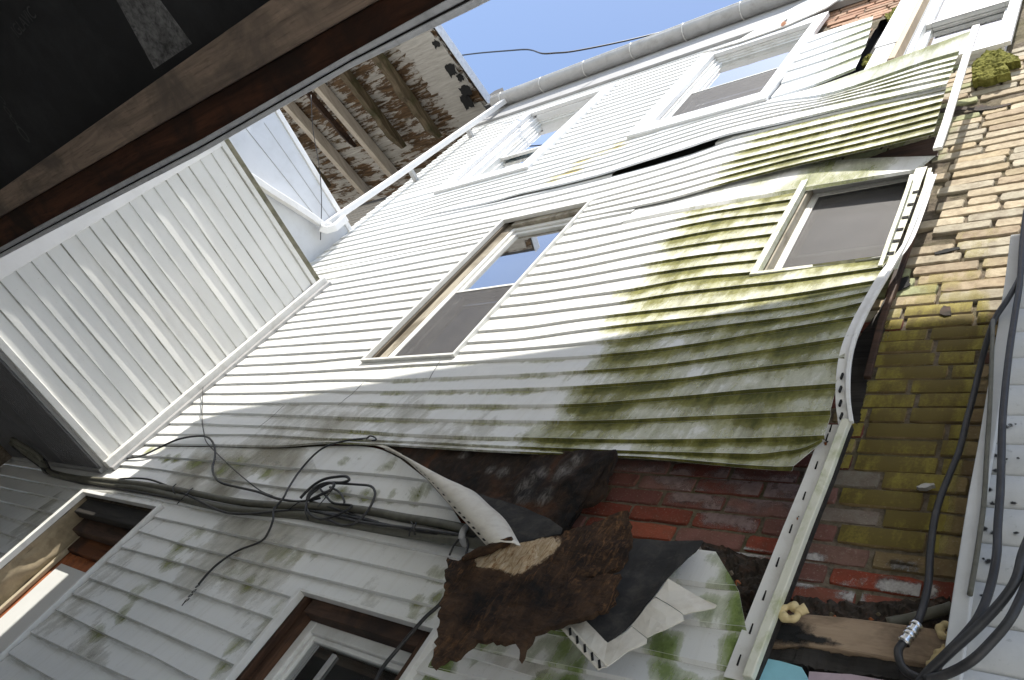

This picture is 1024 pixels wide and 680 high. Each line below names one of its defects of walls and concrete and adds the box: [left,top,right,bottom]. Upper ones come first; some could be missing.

leakage [515,16,970,471]
leakage [312,419,385,445]
leakage [164,444,298,496]